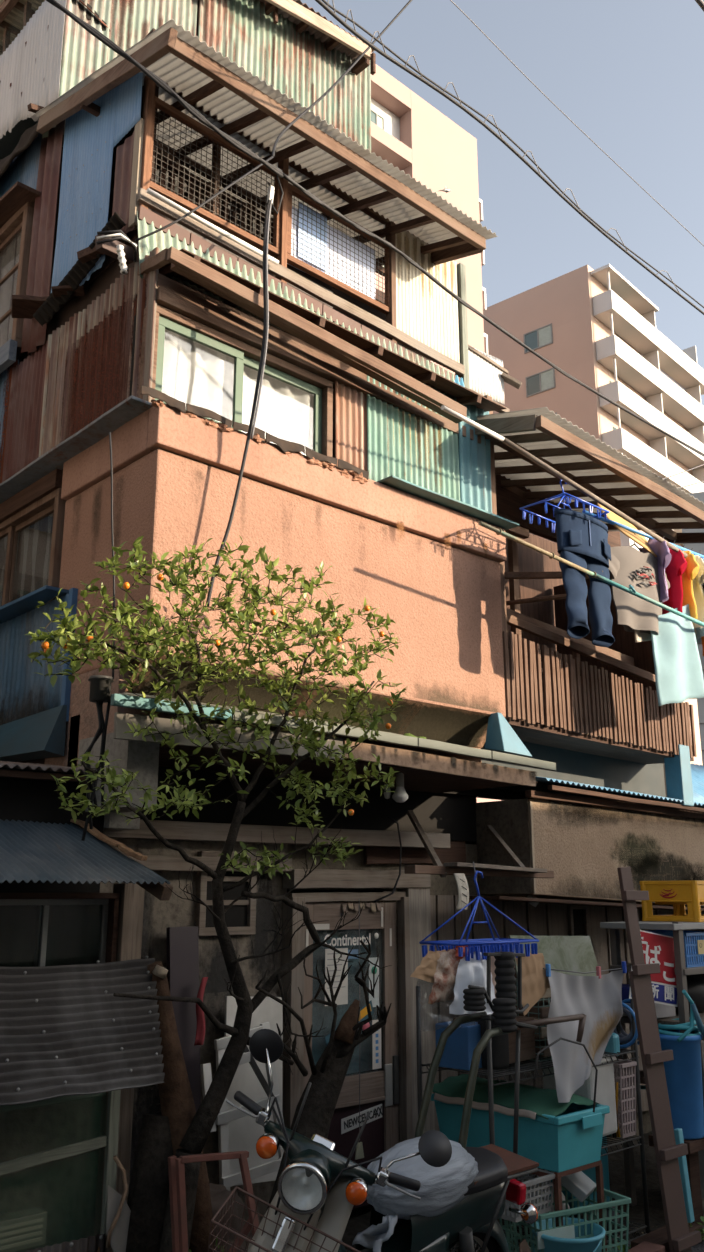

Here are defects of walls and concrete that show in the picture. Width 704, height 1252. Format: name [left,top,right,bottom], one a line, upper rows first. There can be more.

corrosion [111,0,134,46]
corrosion [46,277,146,440]
spalling [141,385,369,484]
corrosion [387,393,442,461]
leakage [549,797,704,825]
leakage [568,834,704,899]